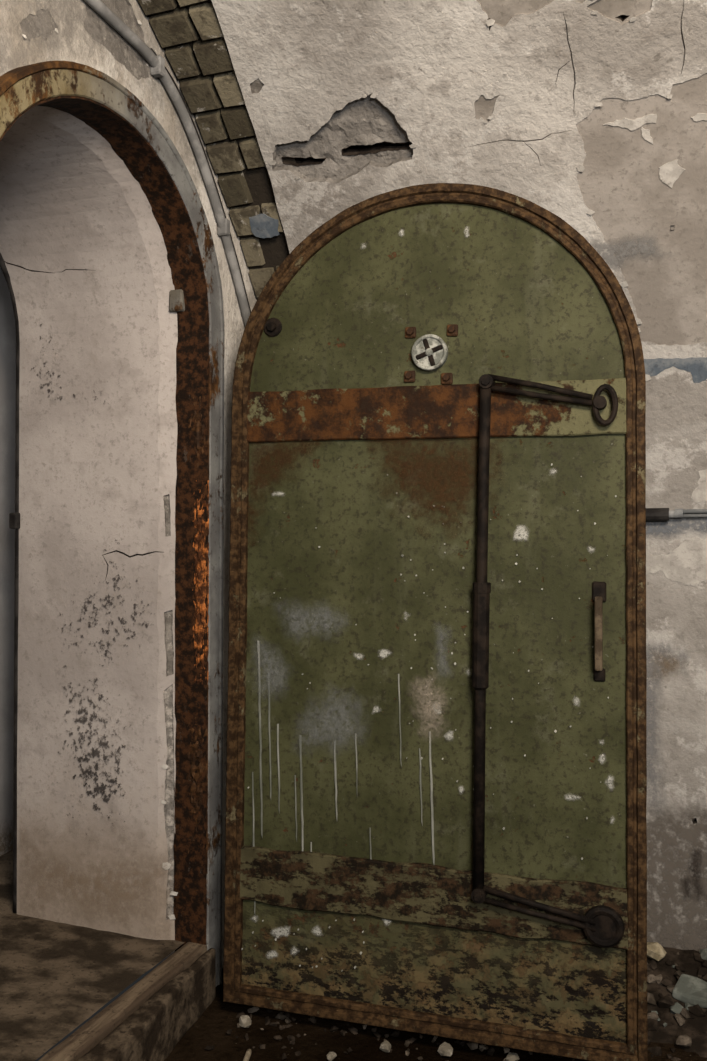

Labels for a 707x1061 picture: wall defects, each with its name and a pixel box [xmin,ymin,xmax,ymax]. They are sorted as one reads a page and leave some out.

flaking render [477,0,554,31]
crack [556,13,576,100]
flaking render [574,0,653,25]
crack [679,0,687,73]
flaking render [269,94,418,183]
crack [470,130,571,165]
flaking render [576,73,707,383]
crack [103,550,164,580]
rust [187,379,210,684]
water stain [58,549,149,819]